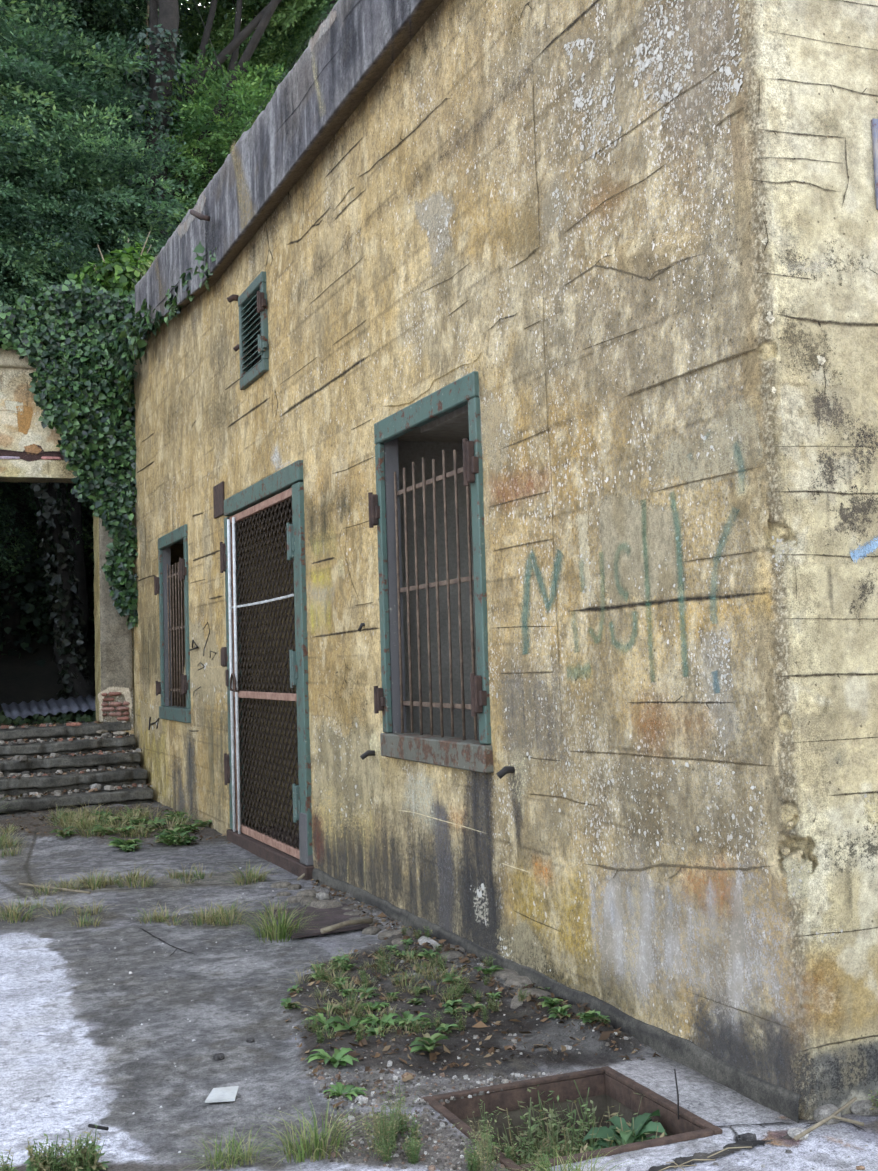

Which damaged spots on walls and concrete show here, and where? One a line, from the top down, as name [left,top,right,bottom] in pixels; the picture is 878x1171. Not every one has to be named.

crack [565,255,699,285]
damp [776,309,878,547]
peeling [698,629,733,690]
damp [313,771,571,988]
spalling [496,679,822,899]
damp [592,858,878,1120]